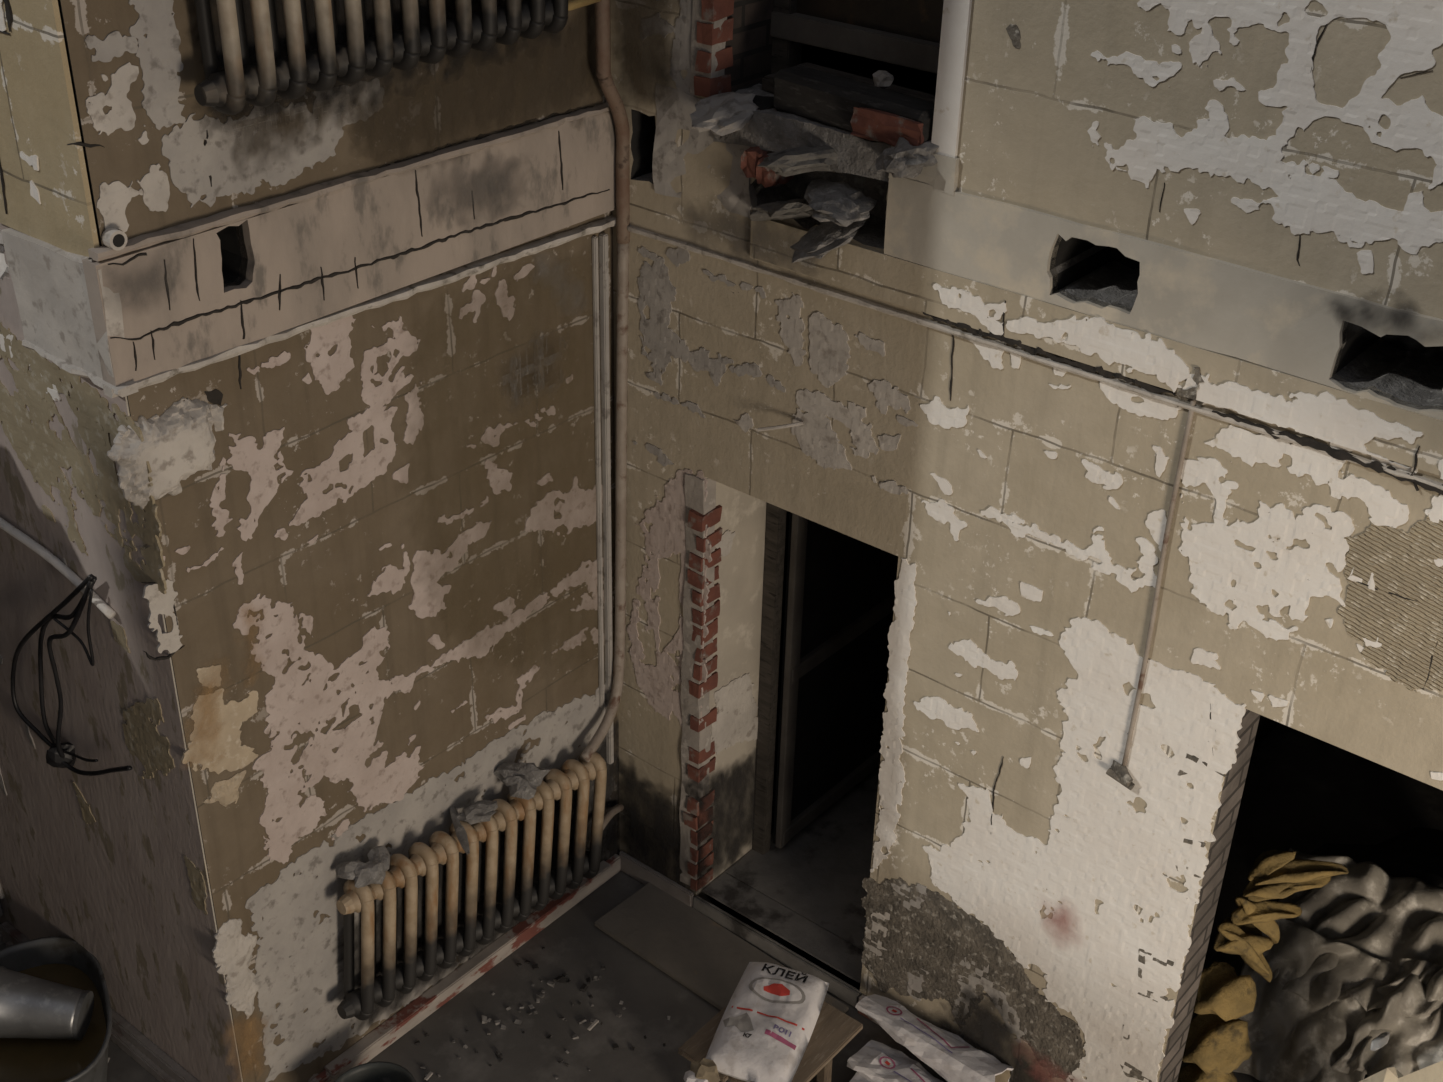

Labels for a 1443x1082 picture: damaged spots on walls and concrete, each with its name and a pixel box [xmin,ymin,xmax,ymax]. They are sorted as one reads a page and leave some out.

peeling [0,316,424,654]
peeling [84,0,384,232]
damp [236,88,340,152]
crack [88,106,610,389]
peeling [367,406,556,619]
crack [923,301,1176,401]
peeling [933,283,1443,692]
peeling [1087,0,1443,274]
crack [1212,410,1443,495]
peeling [122,558,614,1082]
crack [991,758,1003,825]
peeling [861,558,1289,1082]